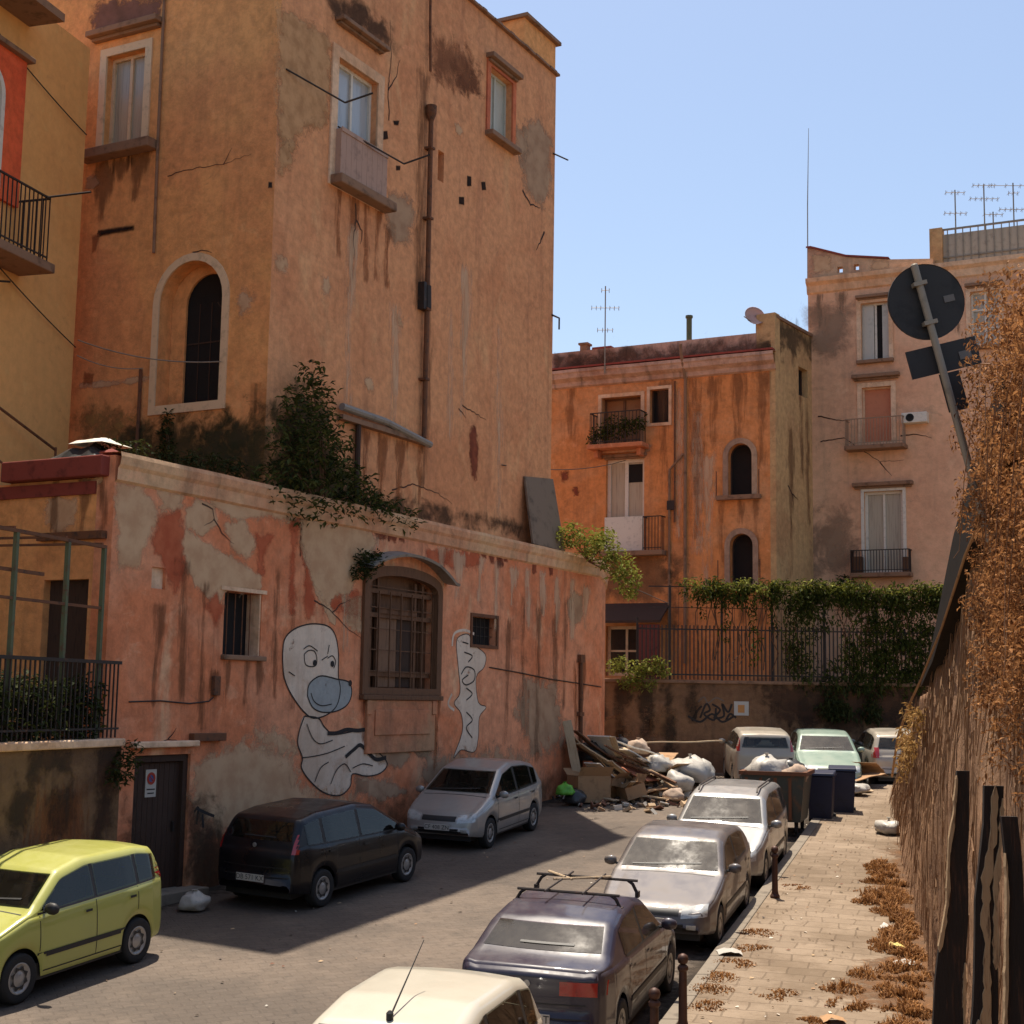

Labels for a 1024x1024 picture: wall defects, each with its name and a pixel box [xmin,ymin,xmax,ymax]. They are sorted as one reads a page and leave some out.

leakage [329,0,389,46]
leakage [433,40,479,97]
crack [167,148,249,177]
peeling [516,119,553,209]
peeling [387,193,415,245]
leakage [554,293,850,368]
crack [818,416,931,476]
crack [202,503,234,544]
peeling [113,483,404,633]
leakage [477,557,590,640]
leakage [93,747,119,840]